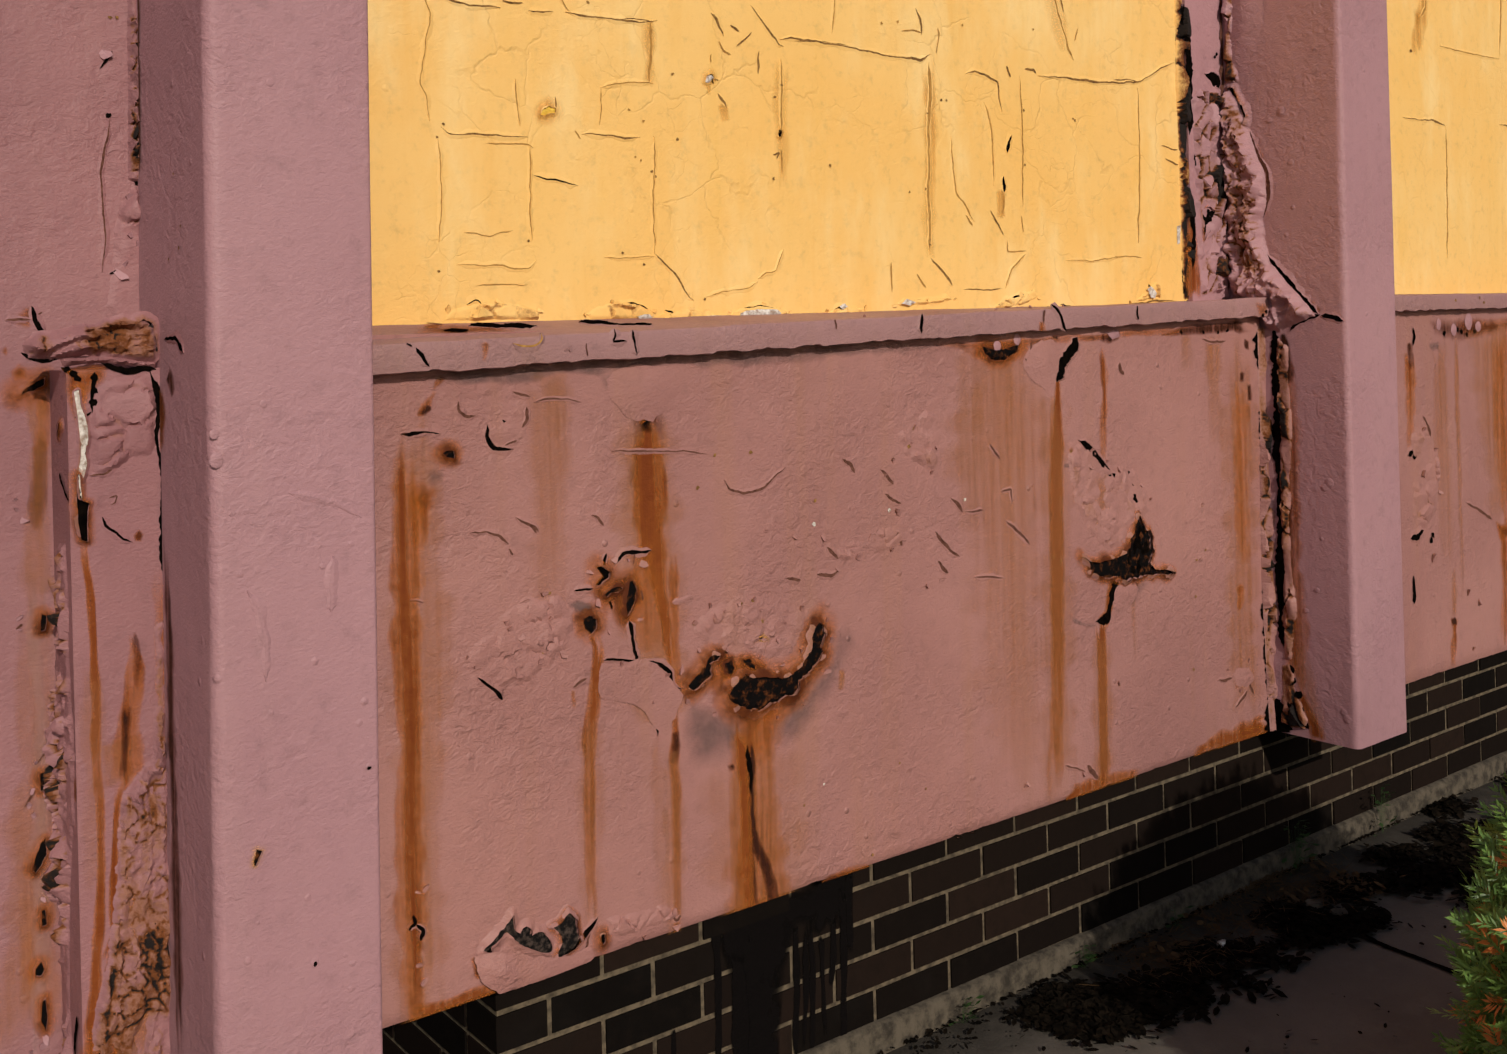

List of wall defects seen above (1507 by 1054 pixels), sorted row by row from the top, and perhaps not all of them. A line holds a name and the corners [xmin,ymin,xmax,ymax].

peeling [24,542,171,1054]
corrosion [82,555,144,1043]
corrosion [391,459,495,1021]
crack [407,322,538,367]
peeling [476,904,683,959]
crack [416,0,784,301]
corrosion [573,419,832,912]
crack [710,0,1196,333]
crack [1040,302,1080,382]
corrosion [1049,381,1176,800]
peeling [1053,438,1176,586]
peeling [1191,0,1324,739]